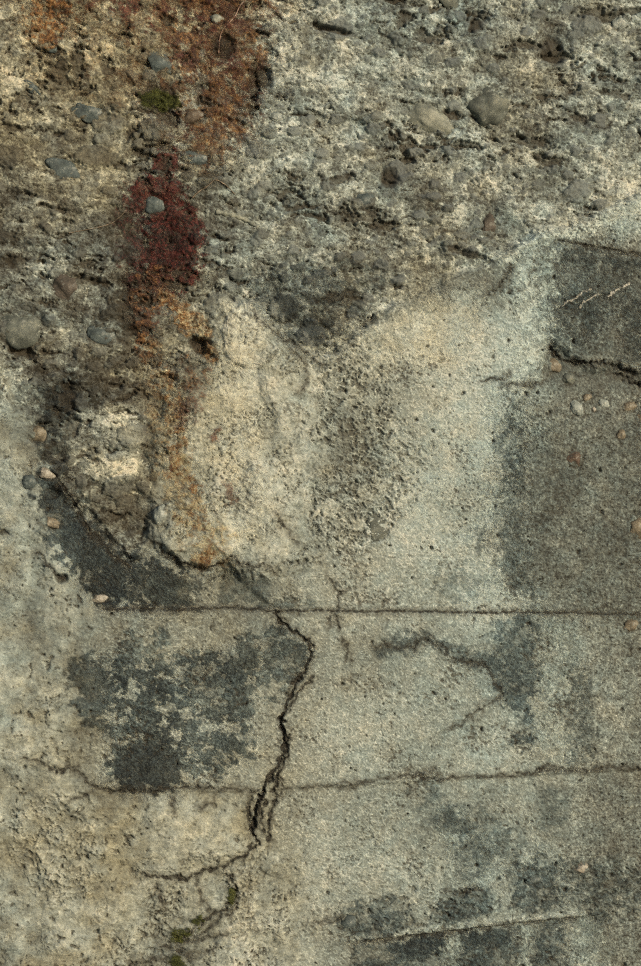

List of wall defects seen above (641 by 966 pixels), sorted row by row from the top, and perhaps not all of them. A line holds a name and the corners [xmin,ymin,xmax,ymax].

rust [22,0,276,173]
water stain [28,374,207,612]
rust [117,146,233,569]
water stain [374,188,641,766]
crack [549,345,641,388]
water stain [64,625,309,796]
crack [24,582,641,966]
water stain [336,785,641,966]